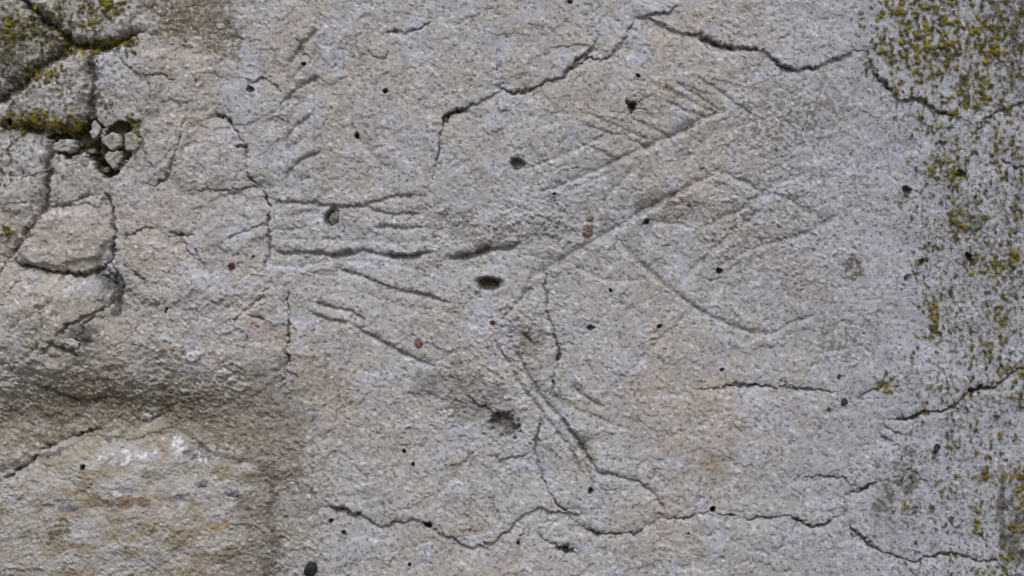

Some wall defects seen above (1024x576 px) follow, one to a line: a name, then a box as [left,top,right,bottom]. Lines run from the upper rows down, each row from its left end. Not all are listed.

crack [0,0,140,294]
crack [908,382,1000,419]